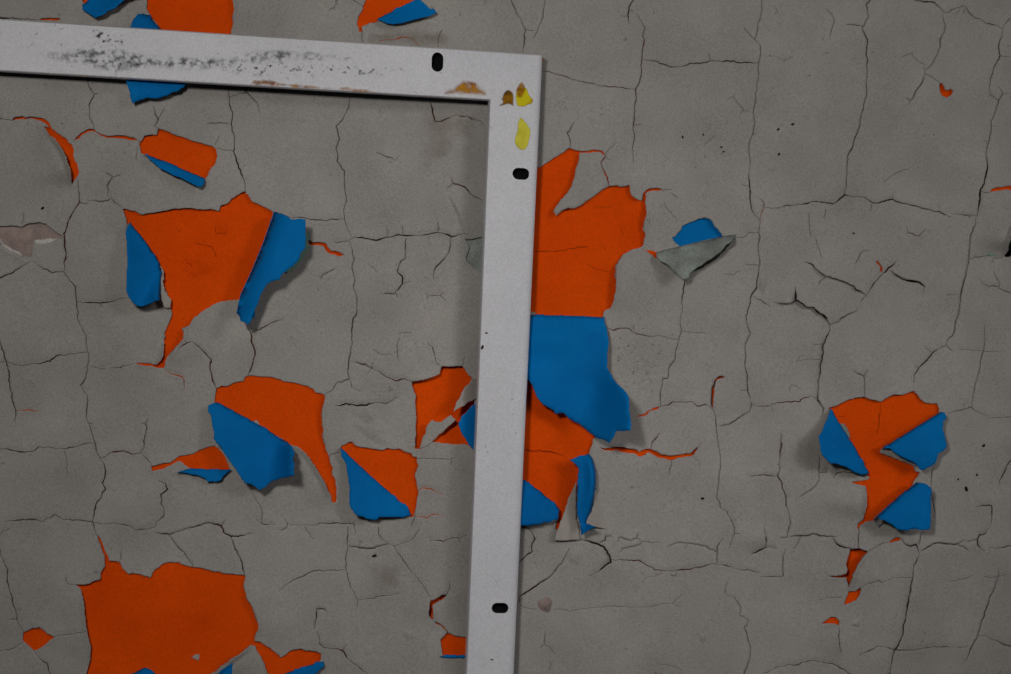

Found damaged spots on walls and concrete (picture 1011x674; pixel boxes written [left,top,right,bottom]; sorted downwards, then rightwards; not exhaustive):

crack [0,14,60,22]
peeling [131,0,234,34]
crack [0,78,165,161]
crack [208,86,259,191]
crack [431,105,484,125]
peeling [123,192,310,368]
peeling [521,148,736,541]
crack [517,0,1011,674]
crack [0,173,465,674]
peeling [151,366,477,520]
peeling [819,391,947,531]
peeling [76,536,324,674]